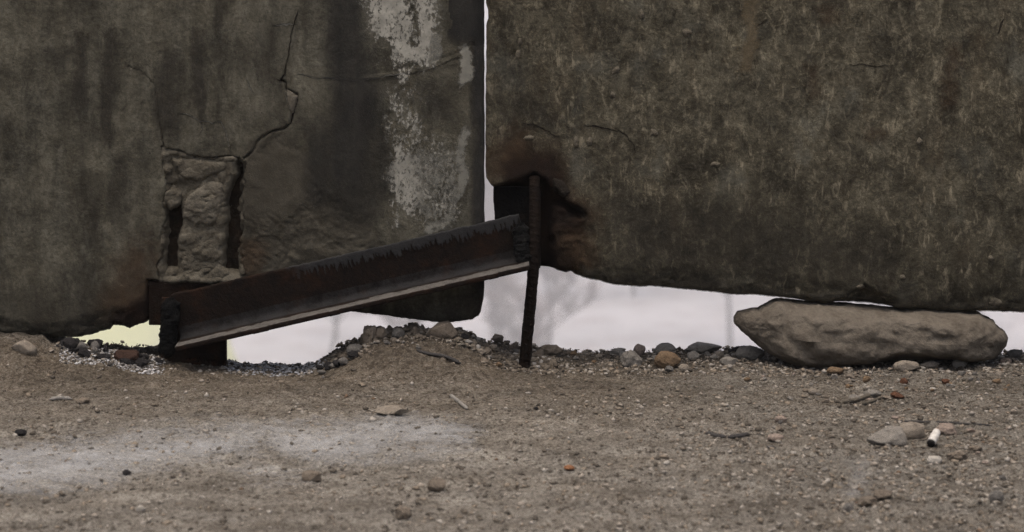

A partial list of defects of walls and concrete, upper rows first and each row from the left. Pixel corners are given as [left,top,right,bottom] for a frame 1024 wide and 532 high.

crack [247,12,336,157]
damp [409,0,484,234]
spalling [156,145,247,285]
spalling [493,180,527,217]
corrosion [488,132,591,273]